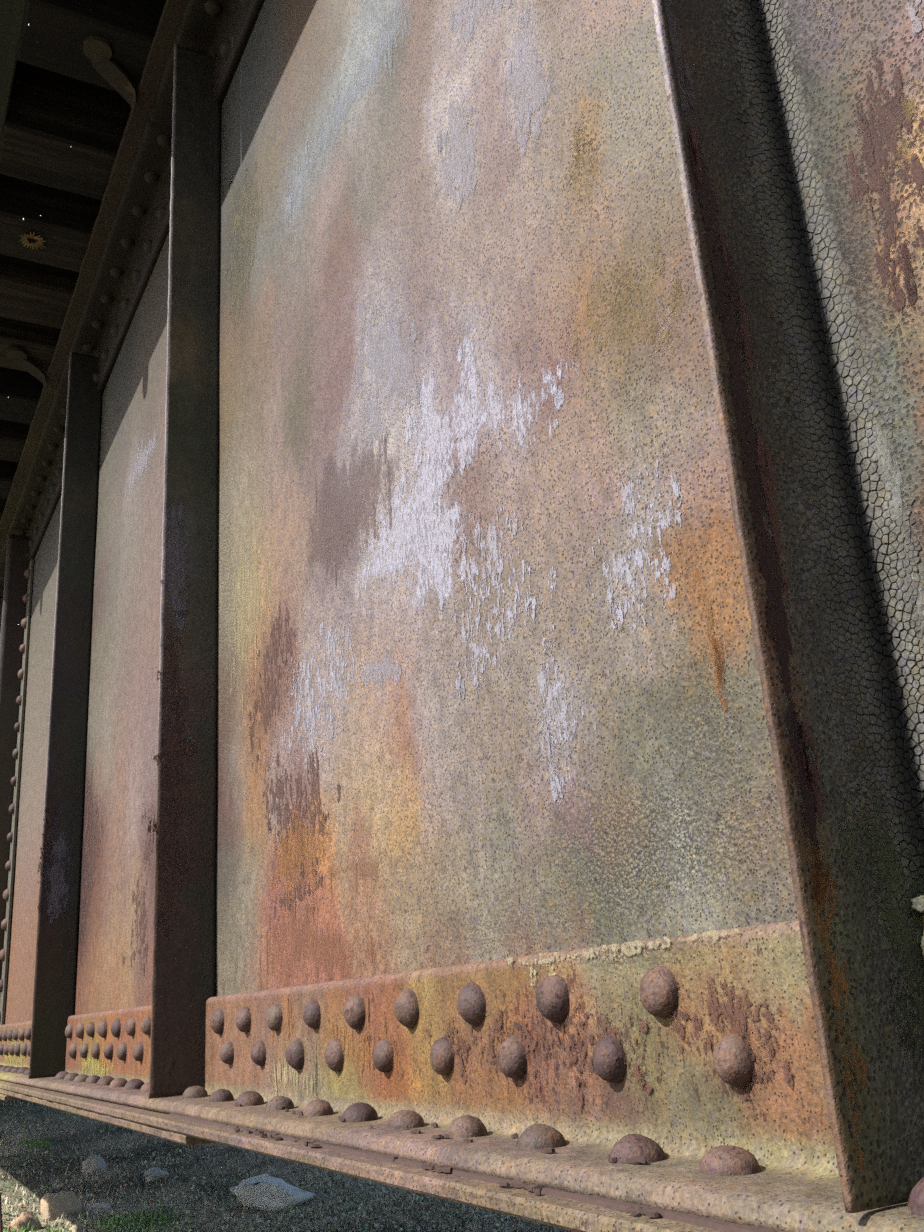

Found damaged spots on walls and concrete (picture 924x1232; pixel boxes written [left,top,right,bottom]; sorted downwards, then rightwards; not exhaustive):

corrosion [845,31,924,315]
crack [722,0,924,949]
corrosion [694,569,727,711]
corrosion [249,605,378,917]
corrosion [79,772,103,965]
corrosion [121,793,154,972]
corrosion [403,1122,473,1143]
corrosion [422,989,660,1113]
corrosion [607,1155,646,1164]
corrosion [666,958,792,1100]